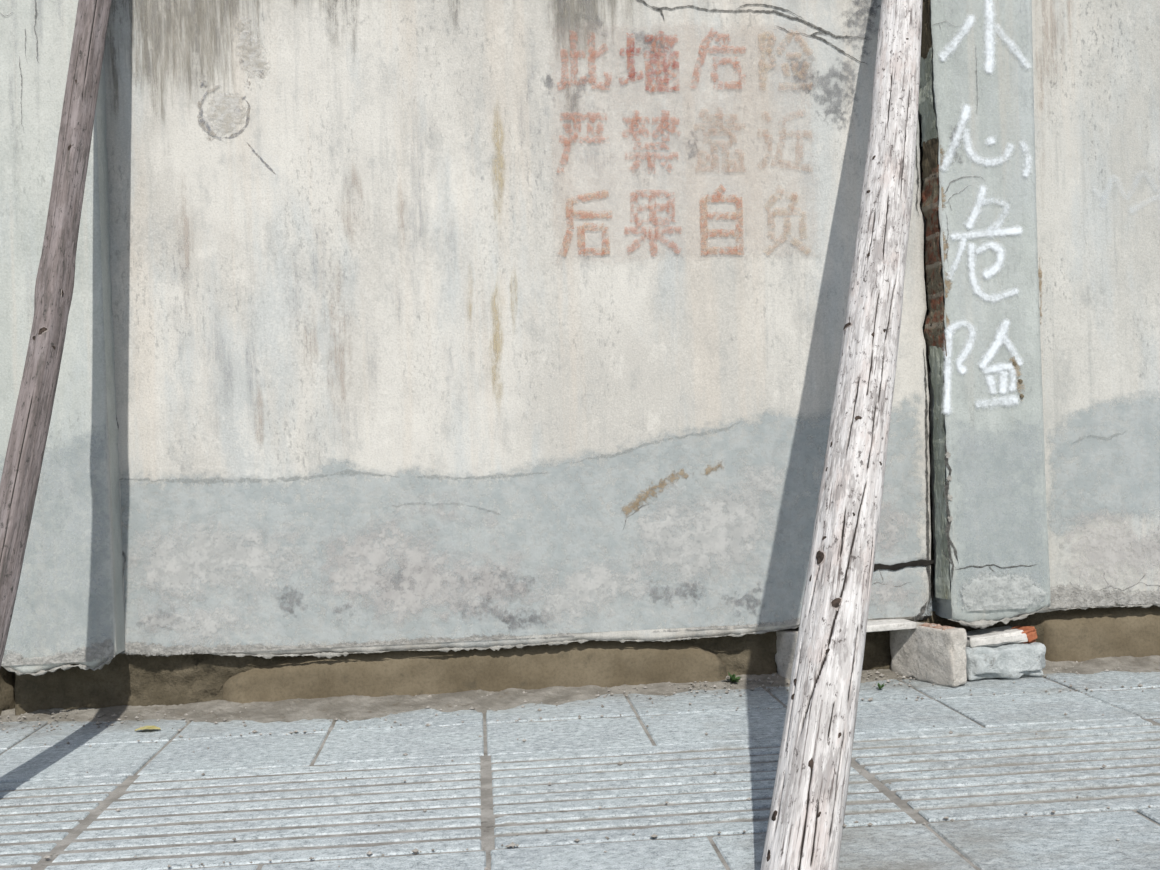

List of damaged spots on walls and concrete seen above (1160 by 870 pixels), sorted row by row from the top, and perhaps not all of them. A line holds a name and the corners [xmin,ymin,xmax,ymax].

leakage [129,0,228,76]
crack [638,0,869,64]
leakage [847,0,876,47]
leakage [791,62,855,120]
crack [873,113,1036,621]
leakage [120,413,830,648]
corrosion [623,469,688,515]
leakage [868,401,928,619]
leakage [1050,398,1160,533]